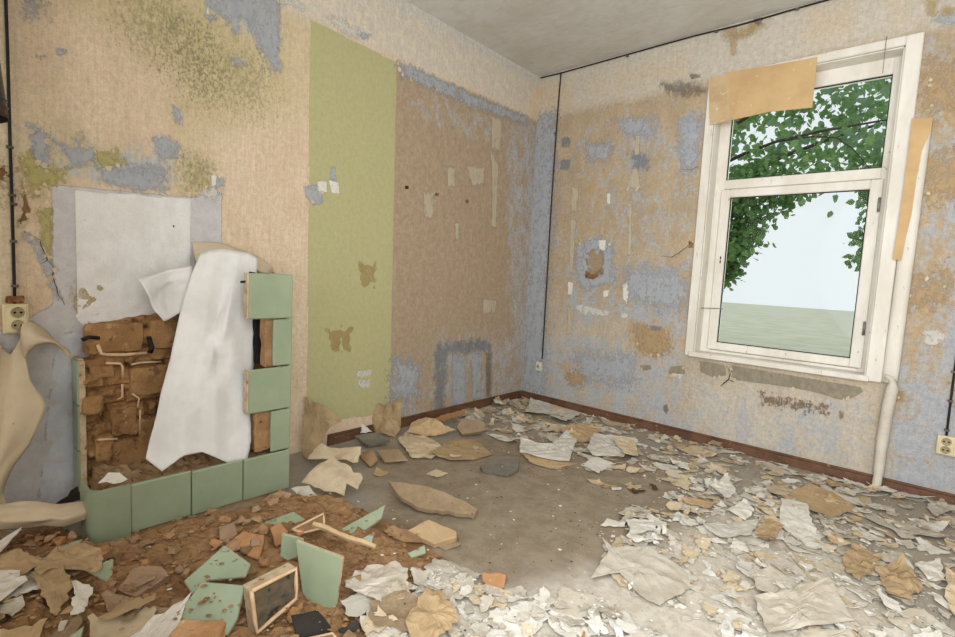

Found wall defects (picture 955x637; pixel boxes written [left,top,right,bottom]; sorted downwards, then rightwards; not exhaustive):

peeling [204,0,282,73]
peeling [612,115,659,191]
peeling [925,143,955,208]
peeling [397,62,570,396]
flaking render [0,122,225,504]
peeling [565,187,690,391]
peeling [909,257,954,313]
flaking render [698,361,865,401]